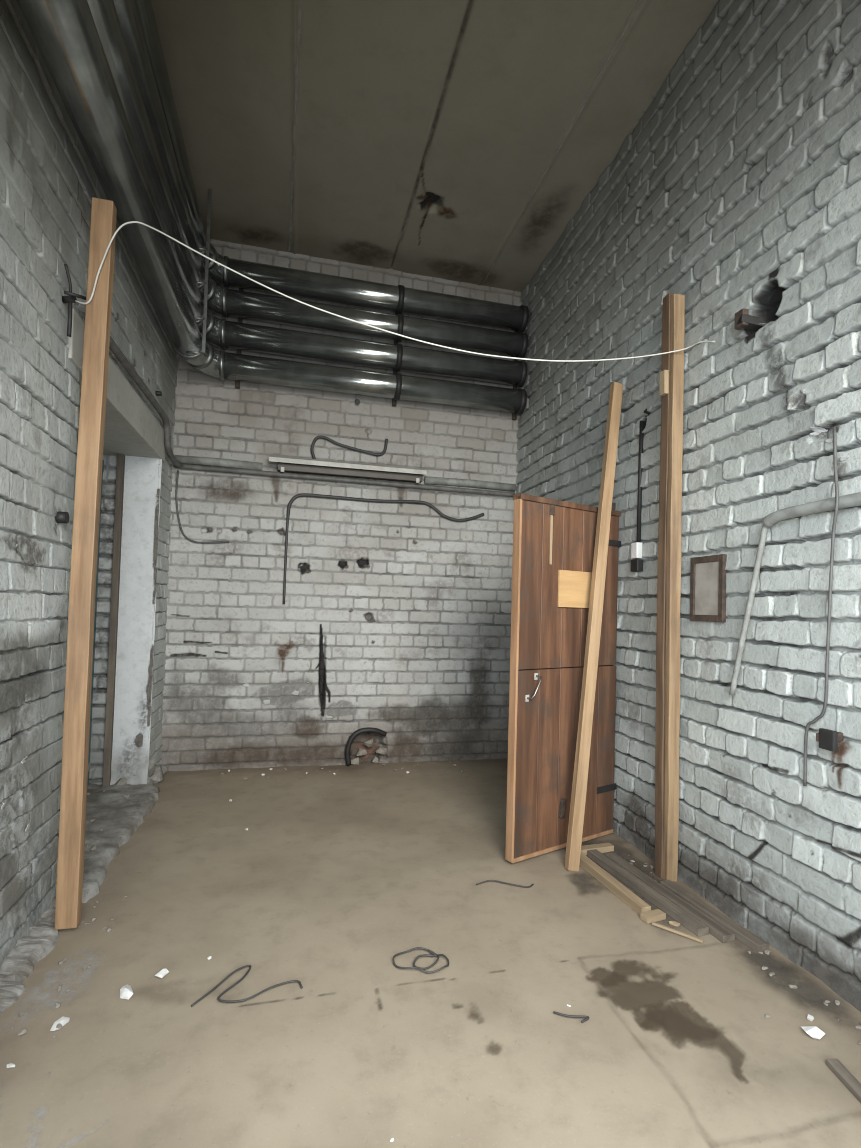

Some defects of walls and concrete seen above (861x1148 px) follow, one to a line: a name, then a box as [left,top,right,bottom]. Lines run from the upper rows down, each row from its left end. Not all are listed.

spalling [744,268,786,343]
water stain [592,961,745,1080]